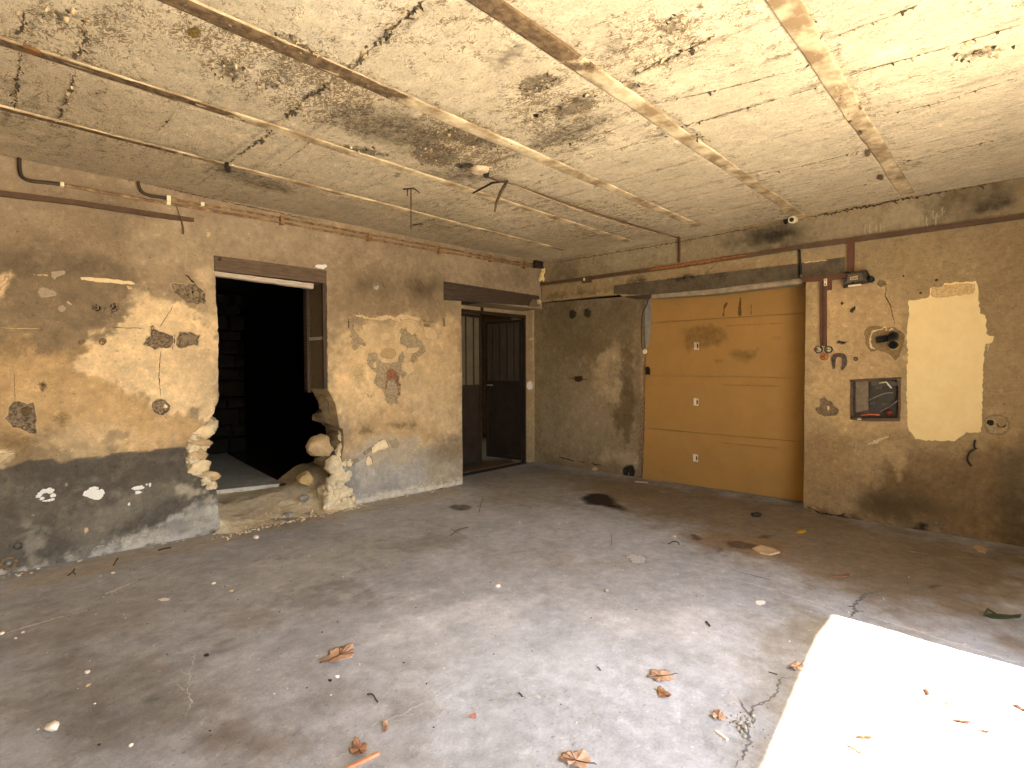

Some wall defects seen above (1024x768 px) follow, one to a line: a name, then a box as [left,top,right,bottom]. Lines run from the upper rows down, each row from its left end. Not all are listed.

crack [9,10,29,109]
crack [55,30,91,124]
crack [128,1,423,220]
spalling [170,275,207,307]
spalling [143,325,202,351]
peeling [348,313,445,399]
spalling [864,326,905,360]
spalling [4,400,38,437]
spalling [185,416,218,490]
spalling [815,398,839,416]
crack [686,567,1023,665]
crack [735,677,794,767]